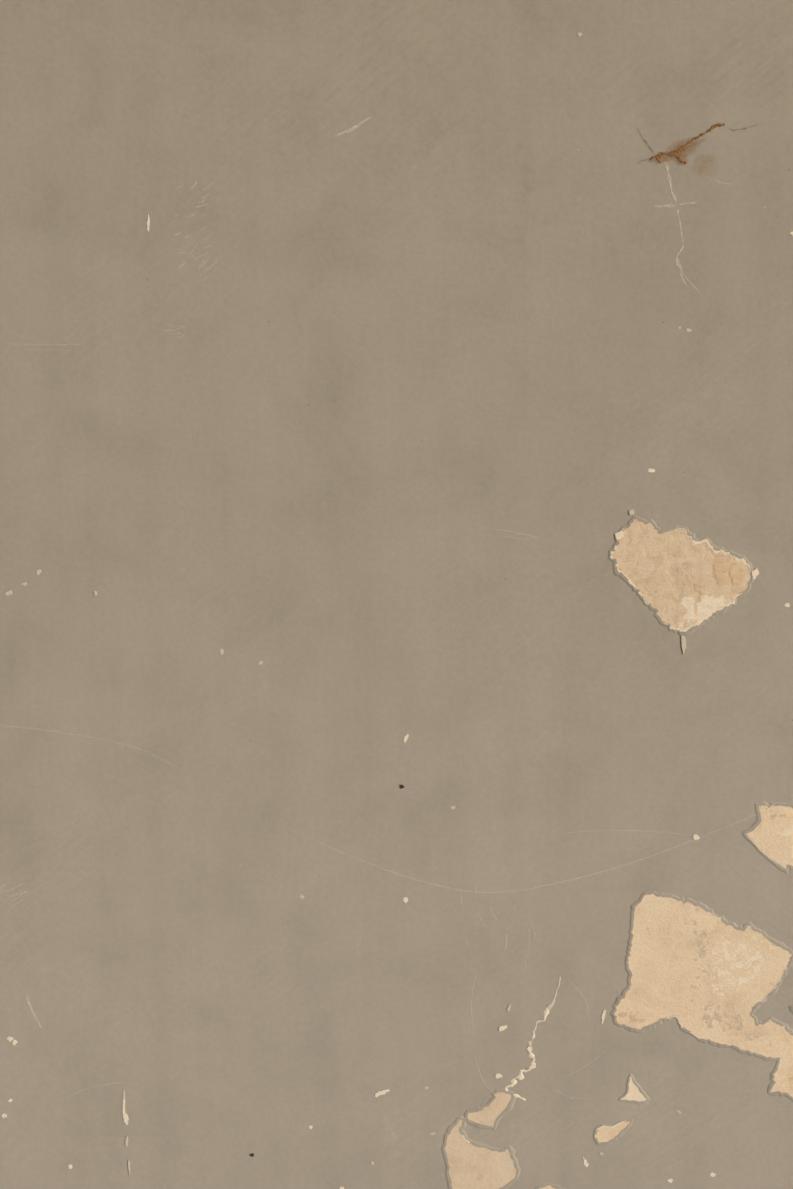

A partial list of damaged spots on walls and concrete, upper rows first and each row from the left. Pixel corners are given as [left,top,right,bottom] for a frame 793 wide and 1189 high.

peeling [608,510,759,654]
peeling [742,801,793,874]
crack [495,977,561,1101]
peeling [601,890,793,1105]
peeling [429,1088,521,1189]
peeling [592,1118,633,1155]